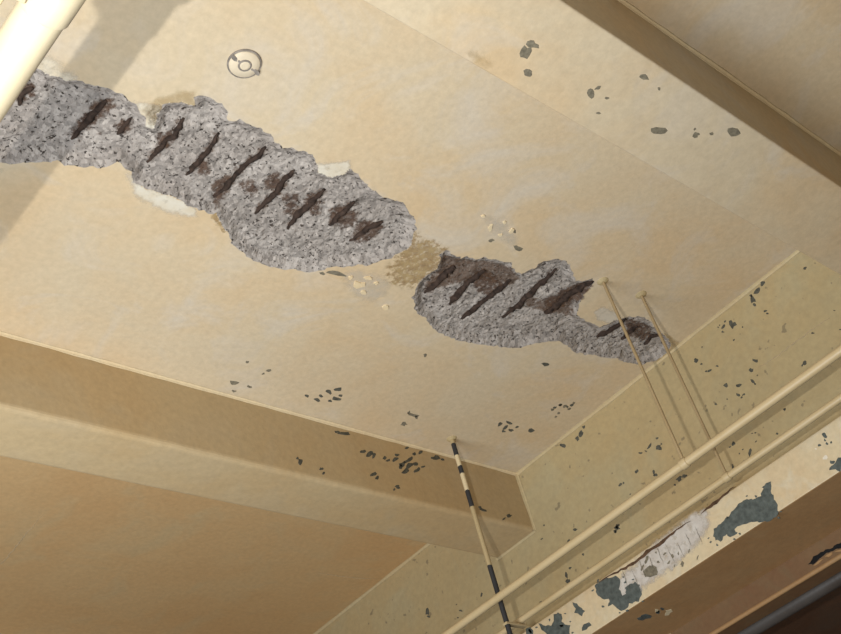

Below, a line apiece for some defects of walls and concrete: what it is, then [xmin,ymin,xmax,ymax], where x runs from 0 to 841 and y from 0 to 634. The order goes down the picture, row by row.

spalling [0,69,417,277]
spalling [412,250,671,365]
peeling [708,482,782,546]
peeling [641,549,699,577]
peeling [809,543,841,565]
peeling [591,576,644,613]
peeling [526,603,591,634]
peeling [637,607,673,621]